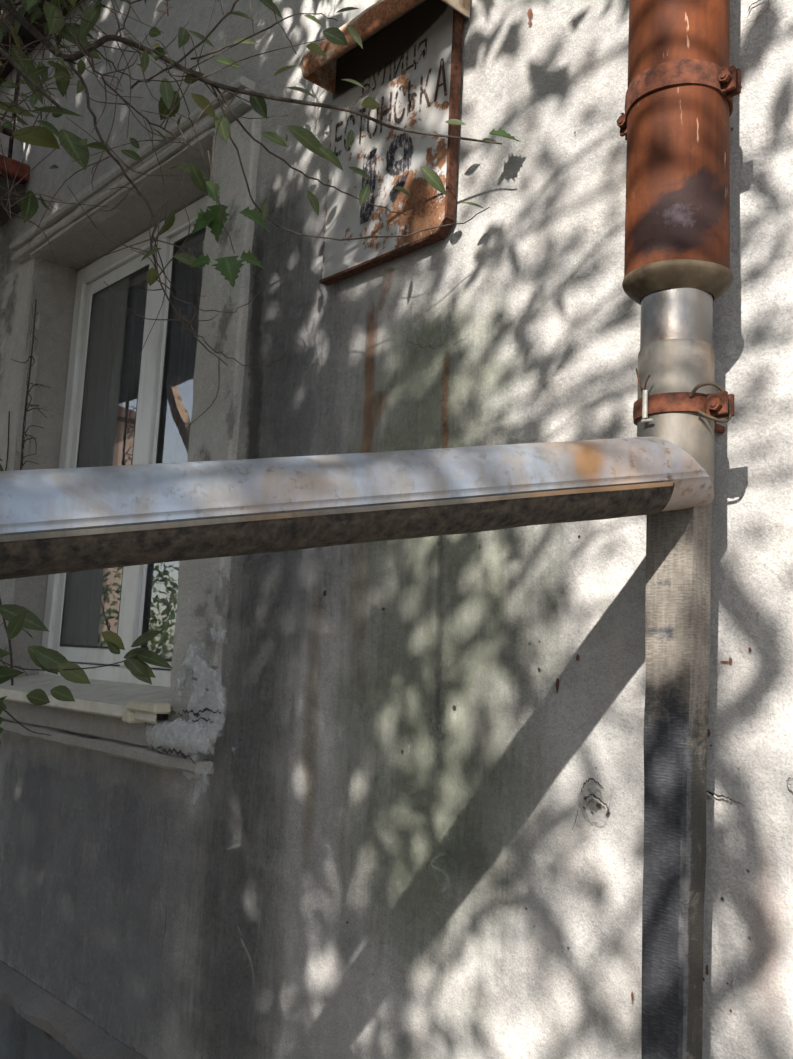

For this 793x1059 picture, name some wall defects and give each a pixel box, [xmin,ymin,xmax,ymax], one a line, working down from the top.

damp [248,193,342,459]
rust [364,313,374,453]
damp [380,316,501,452]
damp [193,548,331,1059]
damp [350,529,515,933]
crack [706,791,742,806]